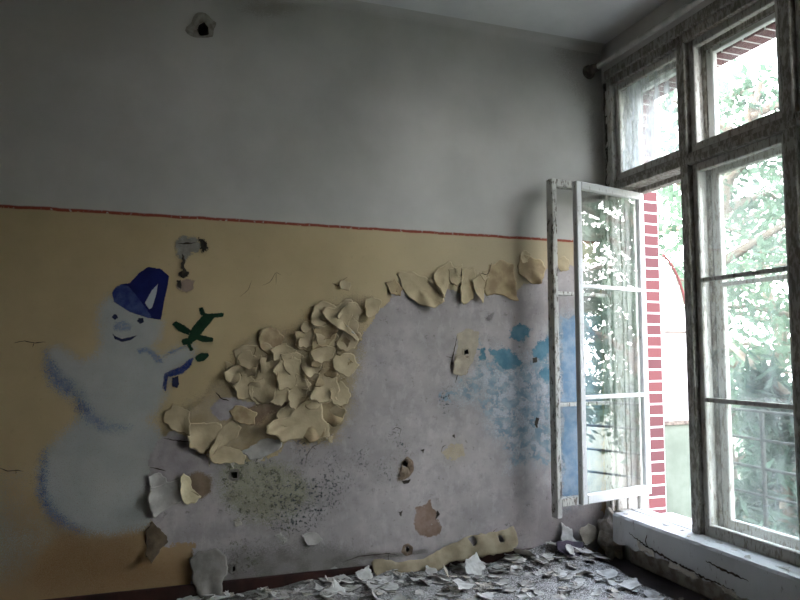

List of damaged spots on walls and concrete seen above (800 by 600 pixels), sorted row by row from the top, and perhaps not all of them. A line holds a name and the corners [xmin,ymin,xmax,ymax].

spalling [185,12,216,38]
spalling [174,235,208,293]
damp [188,327,412,580]
peeling [145,250,625,600]
crack [629,533,749,599]